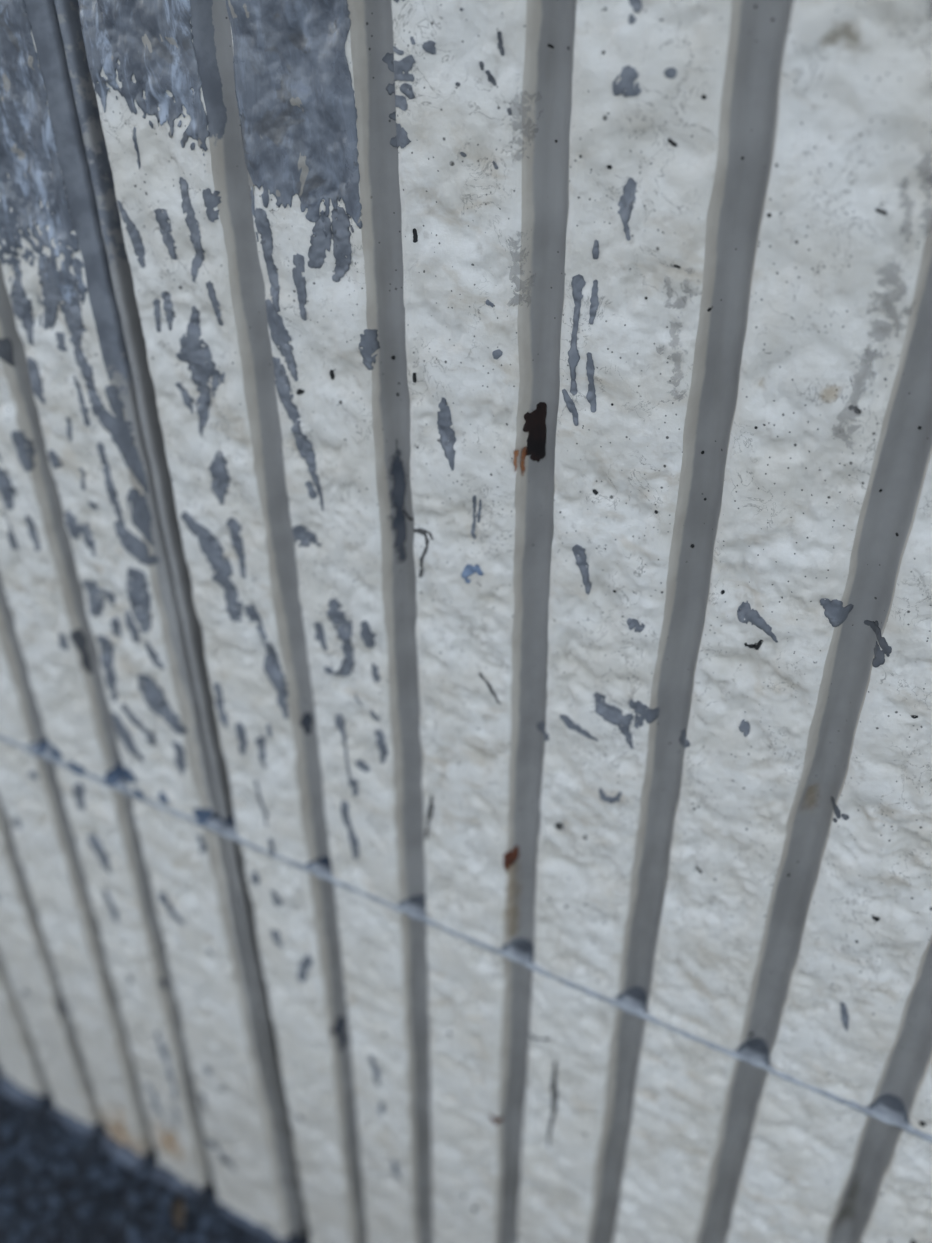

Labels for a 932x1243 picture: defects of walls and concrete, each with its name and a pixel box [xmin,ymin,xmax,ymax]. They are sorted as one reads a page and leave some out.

peeling [382,36,436,149]
peeling [612,65,641,97]
peeling [617,178,637,241]
peeling [153,177,225,437]
peeling [254,206,352,511]
peeling [562,274,599,426]
peeling [0,253,188,799]
peeling [209,451,231,505]
peeling [181,511,289,719]
peeling [737,601,778,643]
peeling [864,620,892,668]
peeling [593,692,660,749]